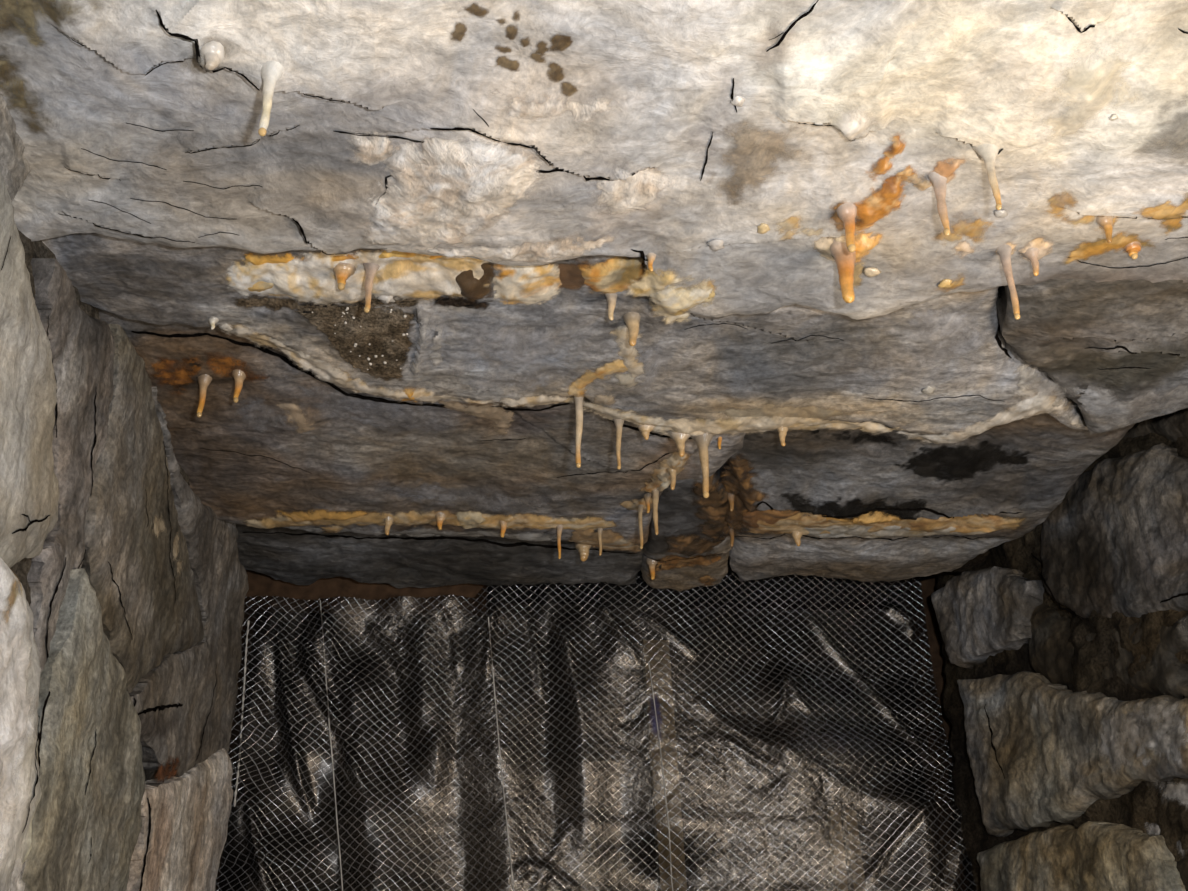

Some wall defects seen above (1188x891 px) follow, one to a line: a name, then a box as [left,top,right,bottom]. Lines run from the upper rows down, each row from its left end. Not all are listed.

crack [145,10,259,90]
water stain [452,4,578,96]
crack [333,109,635,181]
crack [58,123,300,243]
crack [292,218,382,255]
water stain [815,136,965,287]
water stain [996,238,1053,260]
crack [1068,216,1188,269]
crack [995,297,1012,358]
water stain [216,250,1188,482]
water stain [244,485,641,552]
water stain [740,494,1025,539]